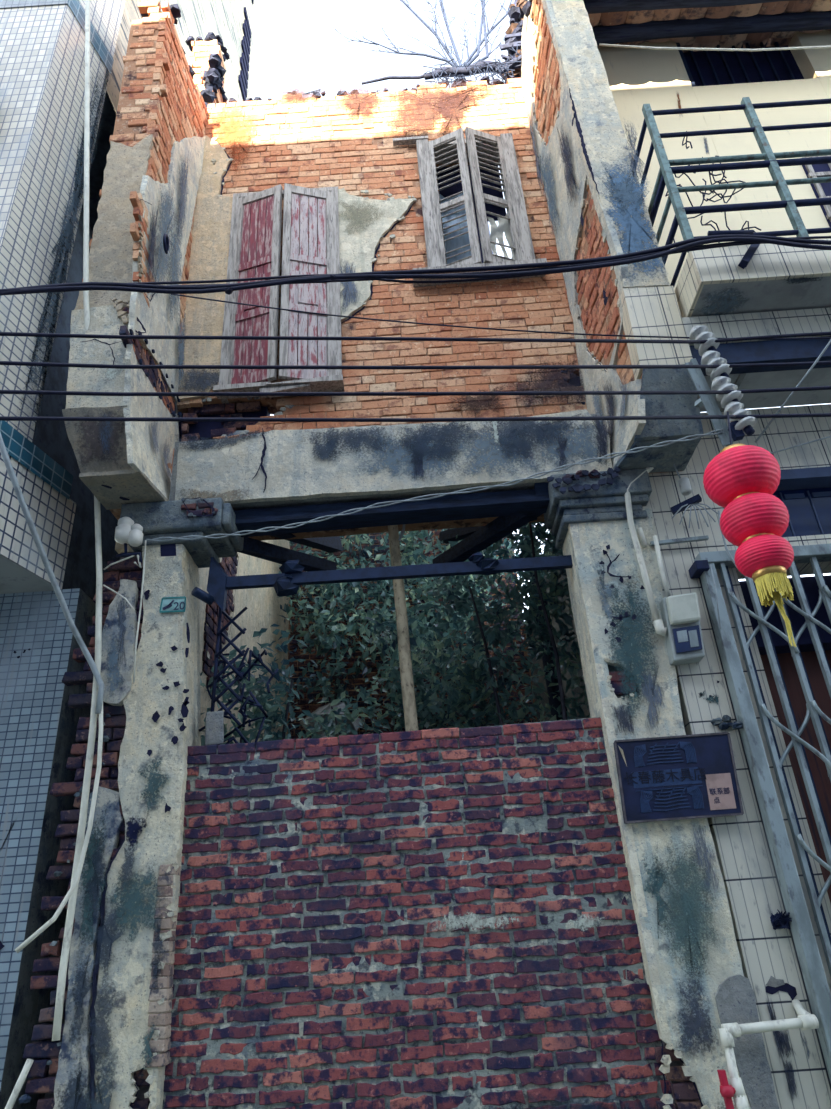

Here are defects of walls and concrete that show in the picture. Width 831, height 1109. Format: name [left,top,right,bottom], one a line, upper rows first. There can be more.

damp [429,91,479,135]
spalling [527,0,561,145]
spalling [574,178,623,373]
spalling [110,298,261,448]
crack [252,428,267,493]
damp [310,379,626,479]
spalling [152,661,189,745]
damp [596,566,664,734]
damp [57,755,169,1109]
spalling [128,857,181,1109]
damp [644,829,719,1055]
spalling [654,1039,709,1109]